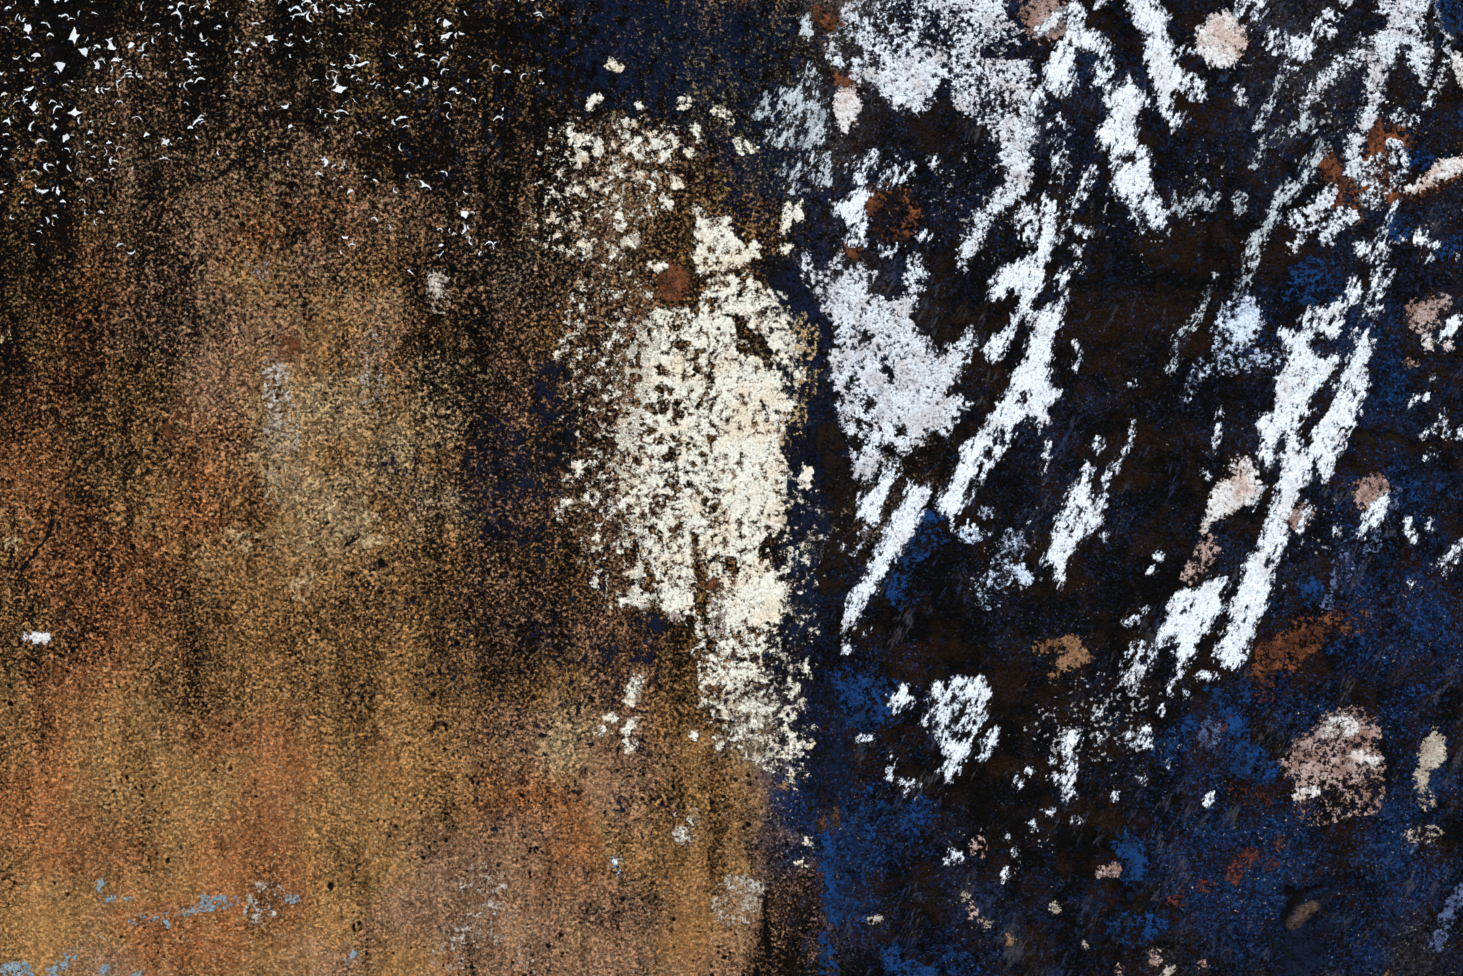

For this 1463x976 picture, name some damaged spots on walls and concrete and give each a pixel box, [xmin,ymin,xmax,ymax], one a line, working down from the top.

rust [242,255,273,280]
water stain [426,269,451,314]
rust [616,255,691,318]
rust [271,333,306,363]
water stain [330,329,391,441]
rust [161,395,194,450]
water stain [260,353,302,509]
rust [672,543,727,641]